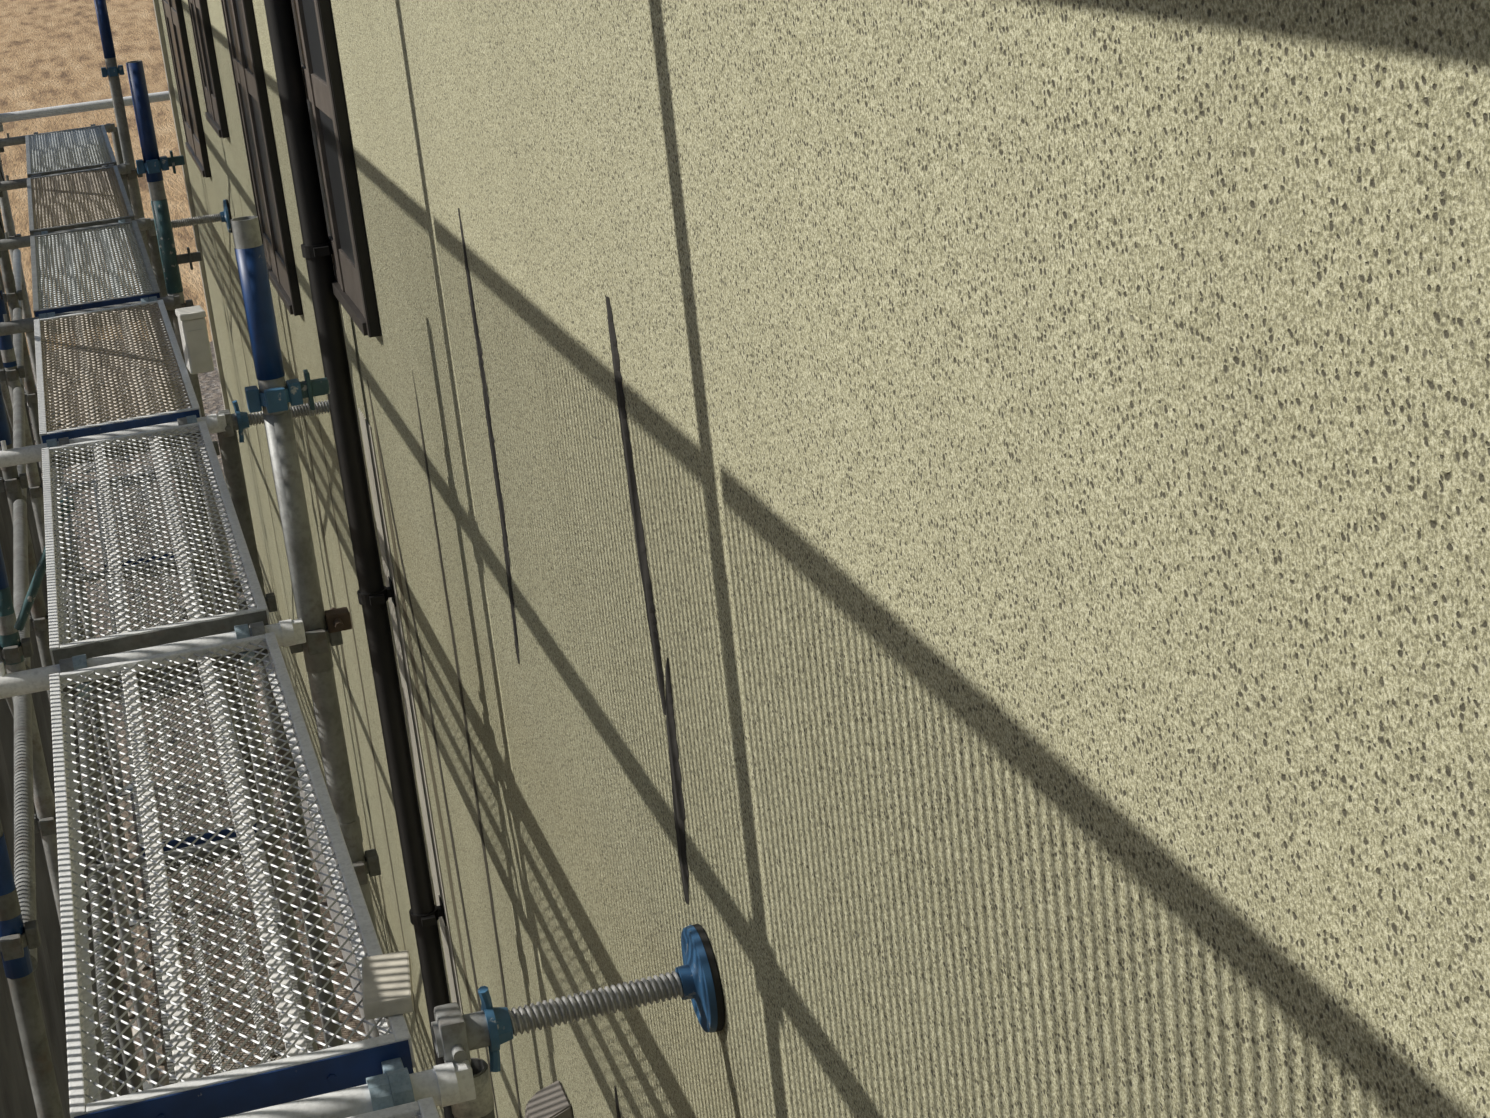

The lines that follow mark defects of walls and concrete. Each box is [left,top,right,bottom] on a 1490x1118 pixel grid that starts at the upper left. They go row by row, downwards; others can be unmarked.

crack [286,310,406,953]
crack [367,371,522,1118]
crack [458,208,520,665]
crack [605,295,689,905]
crack [613,1086,621,1118]